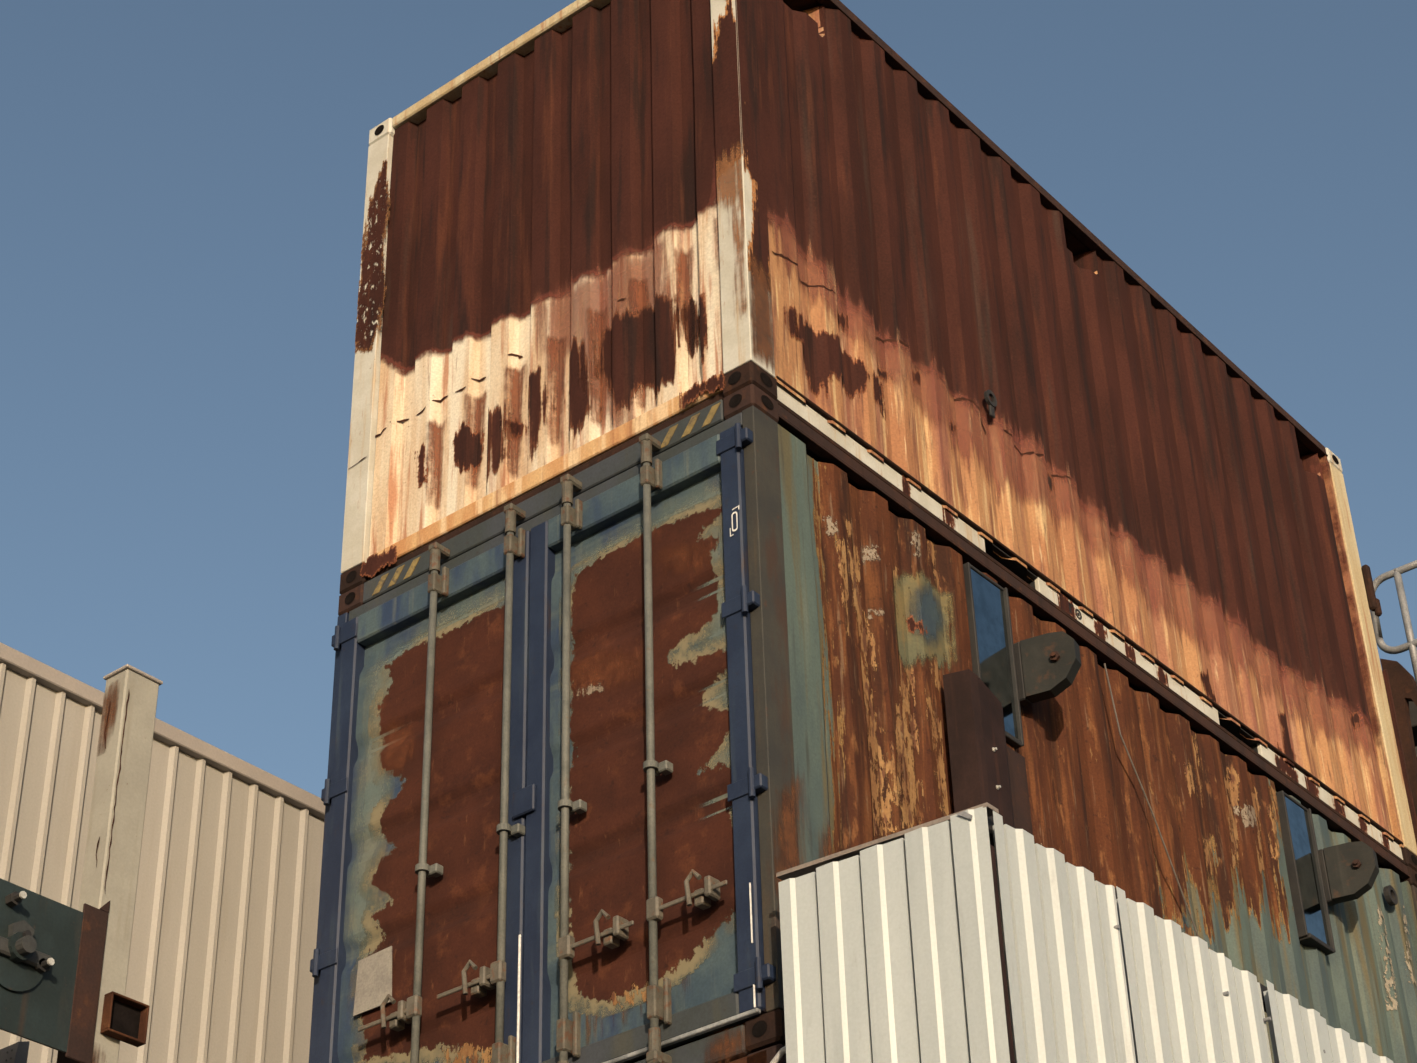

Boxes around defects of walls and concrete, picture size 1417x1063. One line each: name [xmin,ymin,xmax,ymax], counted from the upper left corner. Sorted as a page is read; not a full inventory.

rust [554,493,736,1035]
rust [355,0,1390,950]